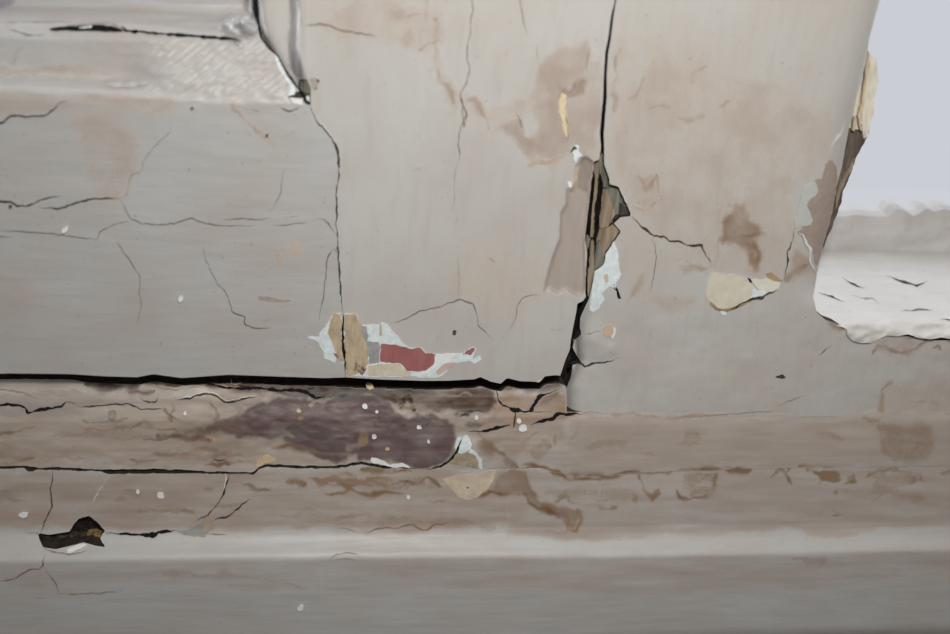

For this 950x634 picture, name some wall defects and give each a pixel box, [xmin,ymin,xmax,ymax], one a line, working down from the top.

crack [307,23,373,36]
crack [0,100,69,124]
peeling [706,51,879,315]
crack [0,108,343,329]
peeling [543,93,621,379]
spalling [613,203,629,219]
peeling [308,313,481,378]
crack [571,358,616,367]
crack [0,383,324,418]
crack [464,390,591,432]
damp [0,382,950,540]